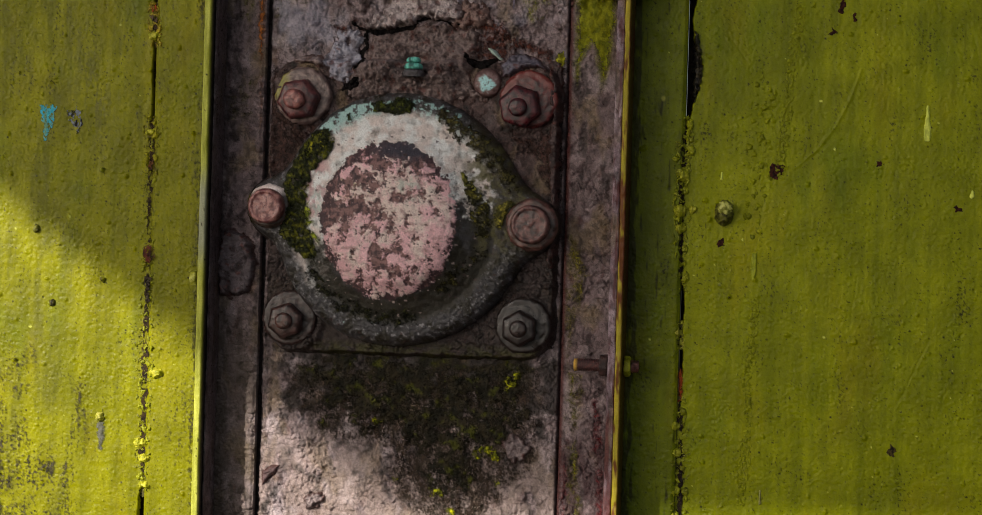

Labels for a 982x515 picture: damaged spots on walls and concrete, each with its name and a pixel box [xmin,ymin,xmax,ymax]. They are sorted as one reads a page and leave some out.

peeling [293,0,494,85]
rust [333,15,553,105]
peeling [488,48,548,78]
rust [141,245,155,263]
leakage [287,356,546,515]